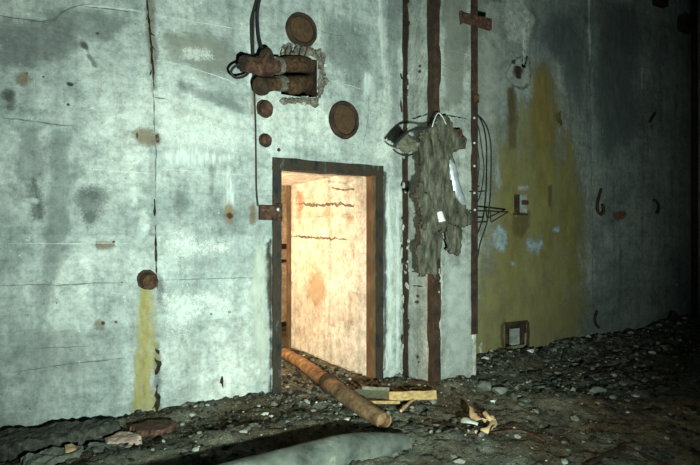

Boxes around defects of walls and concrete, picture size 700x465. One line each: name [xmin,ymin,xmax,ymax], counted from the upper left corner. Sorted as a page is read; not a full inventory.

spalling [277,43,329,108]
crack [0,0,166,290]
corrosion [133,130,159,145]
crack [296,187,355,207]
damp [443,0,605,375]
crack [291,234,347,242]
peeling [400,217,410,272]
damp [135,282,232,411]